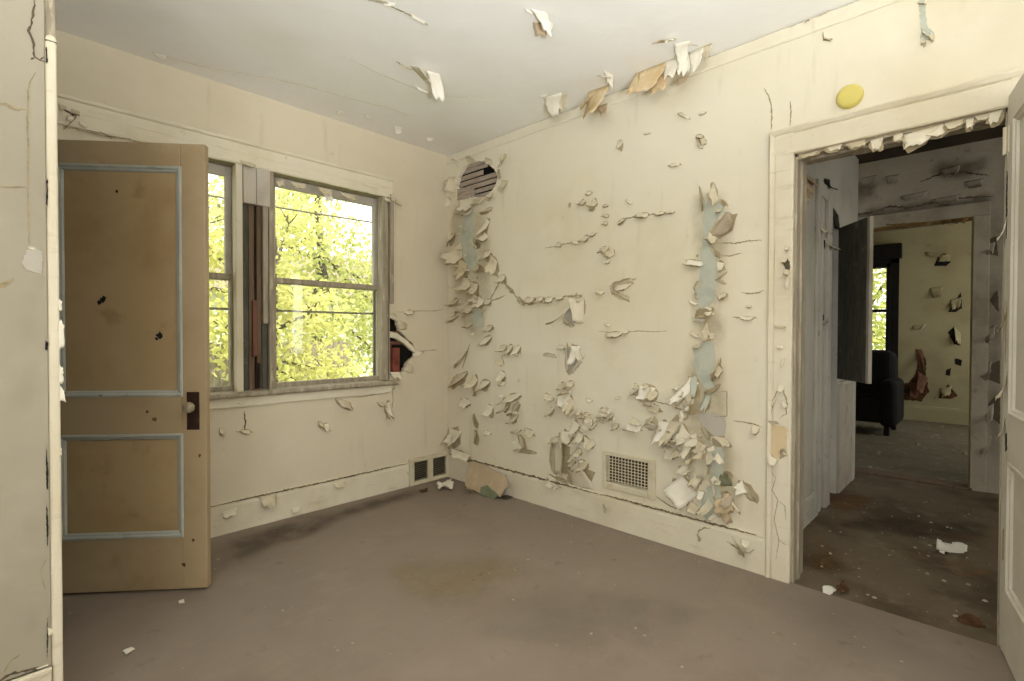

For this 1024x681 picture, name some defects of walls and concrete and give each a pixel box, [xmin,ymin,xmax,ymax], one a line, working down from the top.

peeling [917,0,935,47]
crack [0,0,45,246]
peeling [396,61,445,102]
peeling [580,38,712,119]
crack [764,88,792,129]
peeling [796,109,1005,160]
peeling [986,172,1008,256]
spalling [335,313,424,420]
peeling [440,154,759,542]
peeling [904,349,962,402]
peeling [980,290,1008,457]
crack [448,447,786,558]